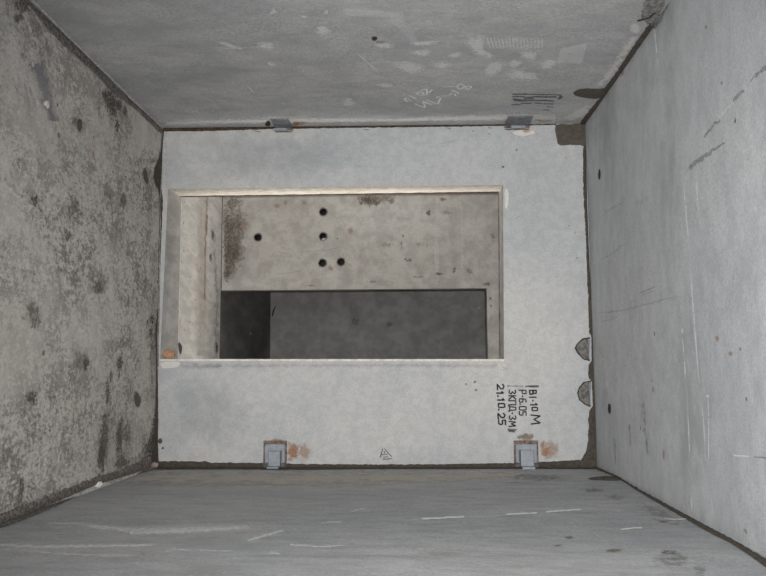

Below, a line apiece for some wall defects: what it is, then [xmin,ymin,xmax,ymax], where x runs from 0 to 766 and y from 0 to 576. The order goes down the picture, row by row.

leakage [102,86,128,132]
leakage [105,356,123,401]
leakage [98,415,127,470]